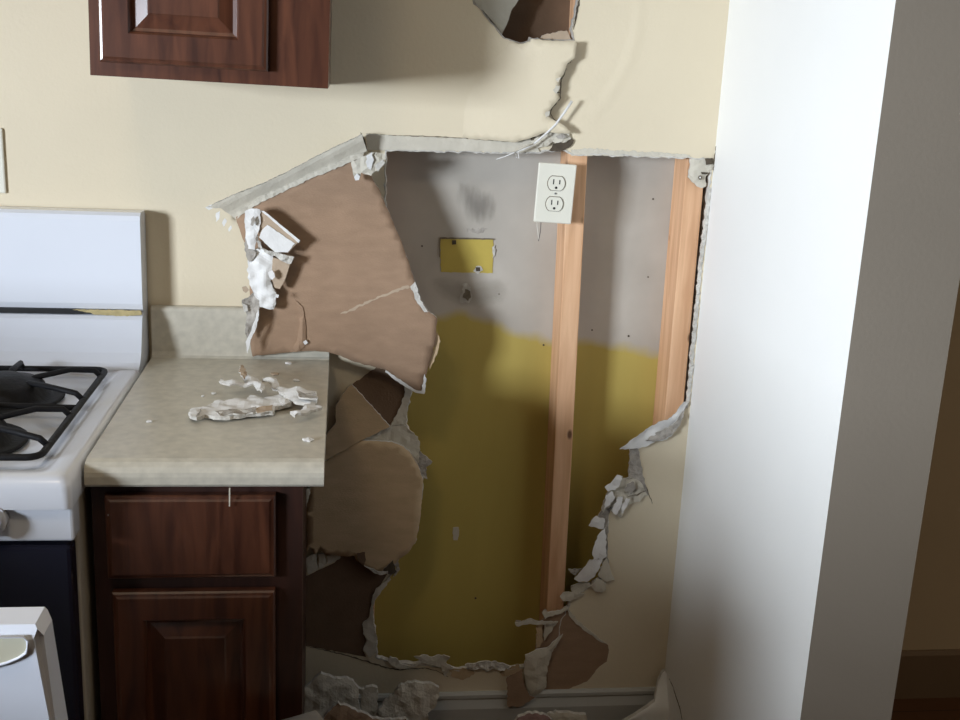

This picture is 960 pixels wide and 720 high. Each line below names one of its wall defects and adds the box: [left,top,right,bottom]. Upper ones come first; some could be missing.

spalling [539,31,571,40]
spalling [237,152,364,218]
spalling [306,148,714,707]